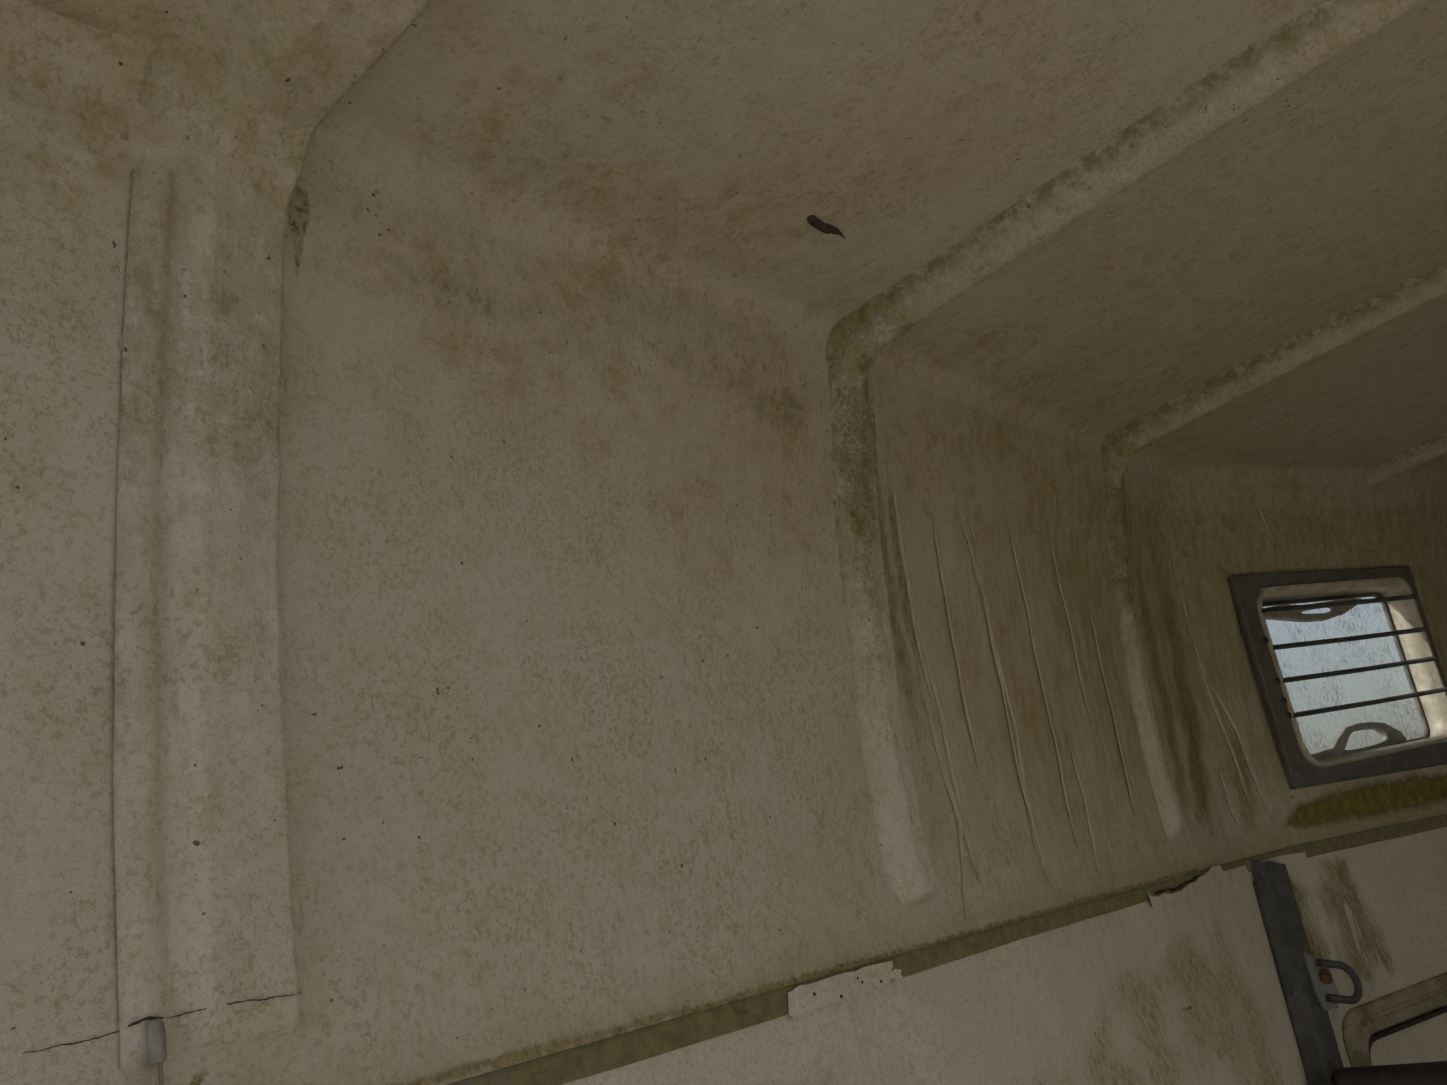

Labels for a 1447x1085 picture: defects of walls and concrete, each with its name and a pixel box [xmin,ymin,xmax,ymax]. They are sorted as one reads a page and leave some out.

crack [23,992,302,1054]